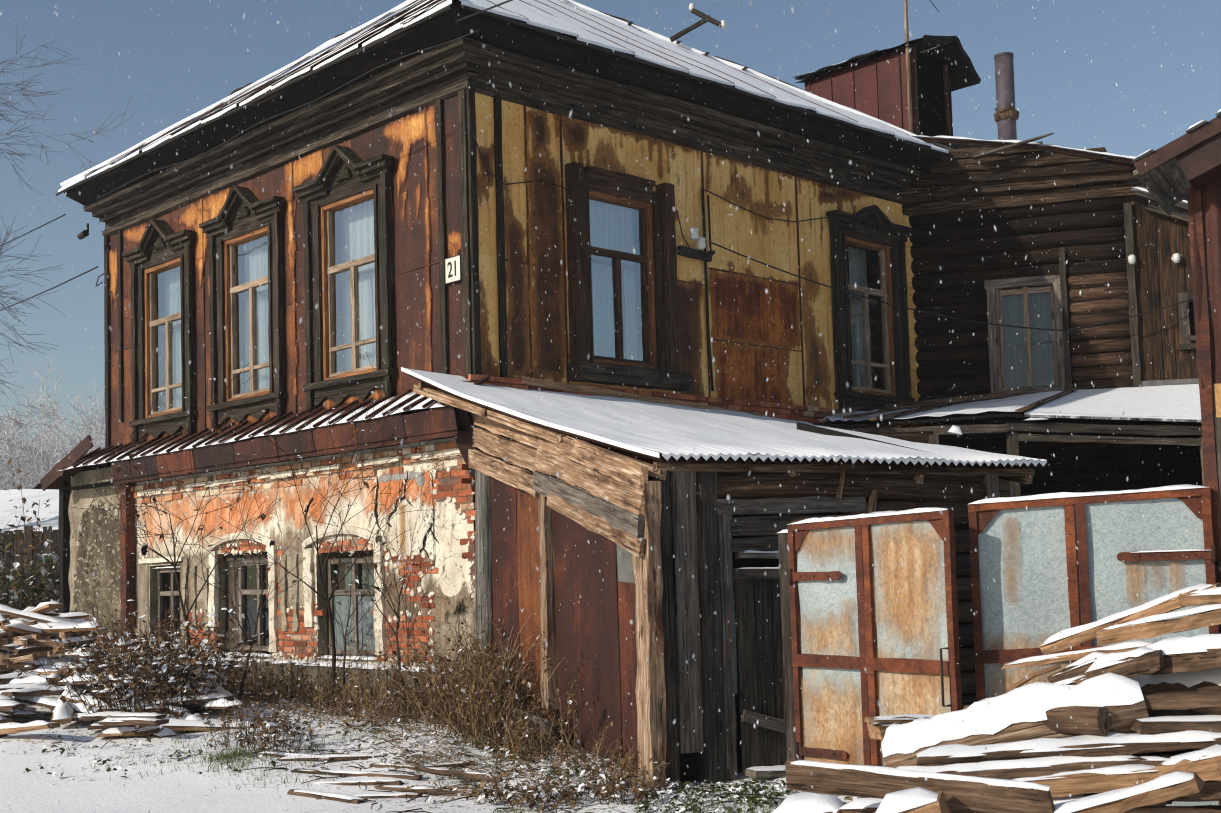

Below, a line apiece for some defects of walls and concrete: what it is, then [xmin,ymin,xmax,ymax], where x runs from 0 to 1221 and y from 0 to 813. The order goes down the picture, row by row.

rust [477,110,871,382]
rust [677,262,831,407]
spalling [139,492,326,661]
spalling [315,534,439,666]
spalling [290,466,476,598]
rust [805,611,853,656]
rust [803,684,864,765]
rust [876,521,939,648]
rust [881,671,950,716]
rust [985,666,1056,697]